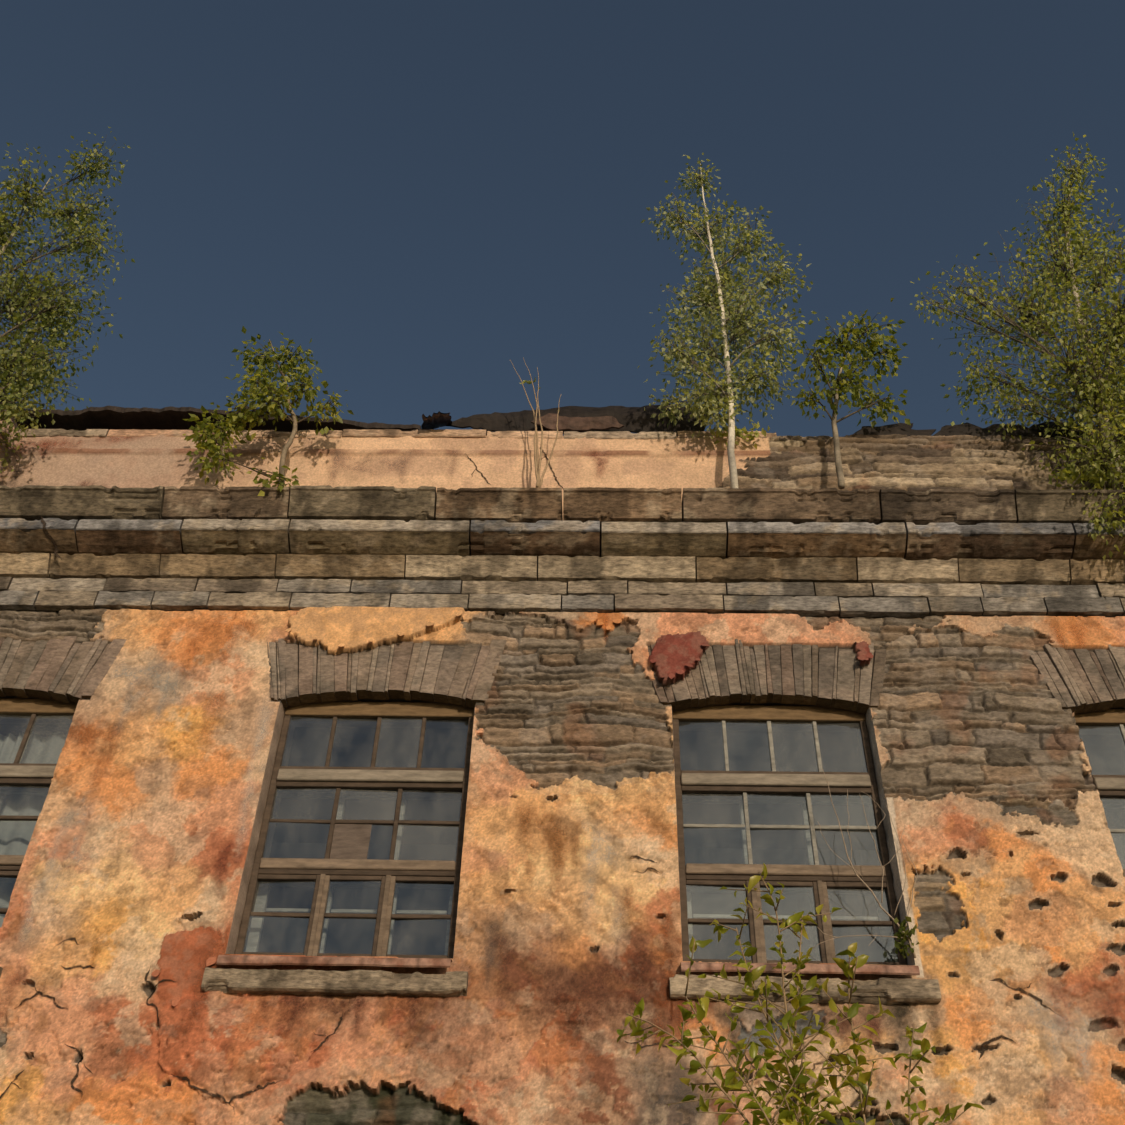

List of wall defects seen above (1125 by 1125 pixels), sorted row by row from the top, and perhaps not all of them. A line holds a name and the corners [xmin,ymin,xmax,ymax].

crack [466,454,490,484]
spalling [285,606,710,802]
spalling [801,615,1098,836]
spalling [912,846,970,943]
hole [1028,898,1049,910]
hole [1091,872,1117,887]
hole [1107,901,1125,928]
flaking render [140,911,224,1008]
hole [1103,943,1125,976]
crack [144,965,177,1026]
hole [1087,1017,1125,1051]
hole [1111,1065,1125,1084]